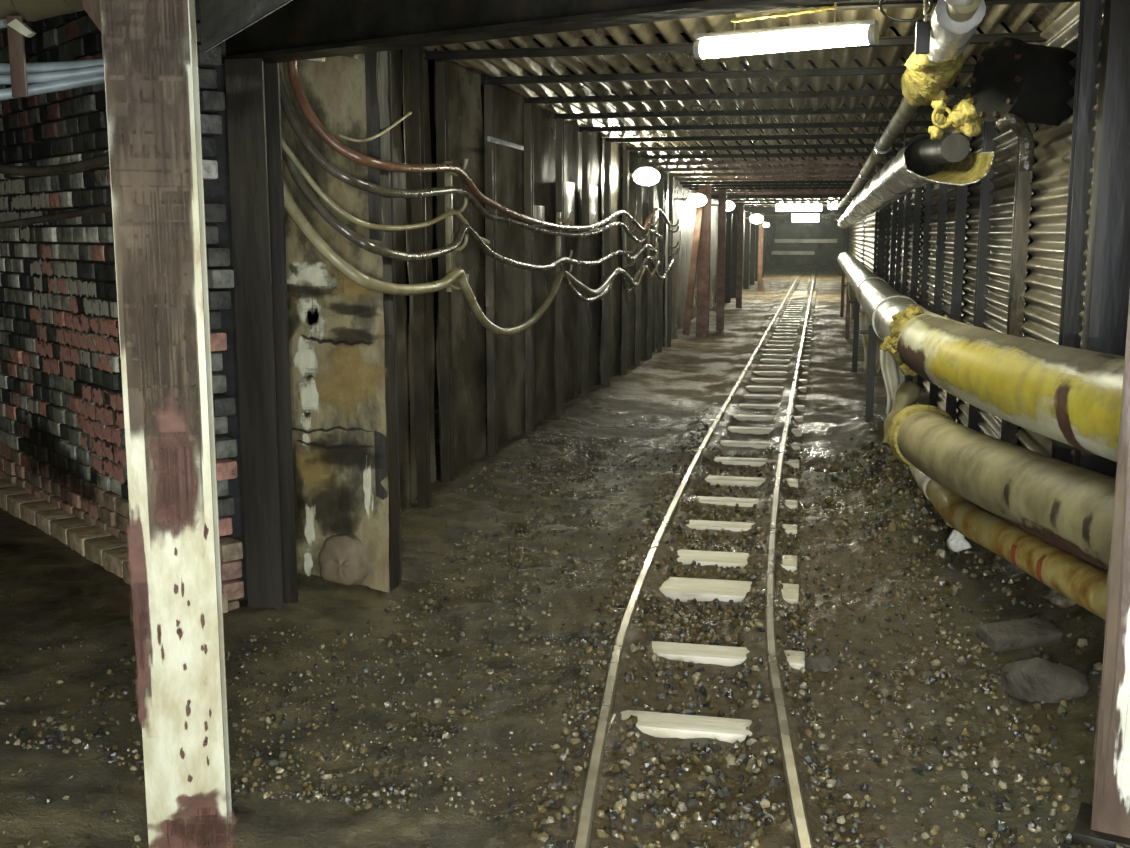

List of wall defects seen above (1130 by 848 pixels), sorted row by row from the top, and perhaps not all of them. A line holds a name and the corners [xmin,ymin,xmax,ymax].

corrosion [99,0,209,727]
peeling [1114,608,1130,811]
corrosion [148,775,236,848]